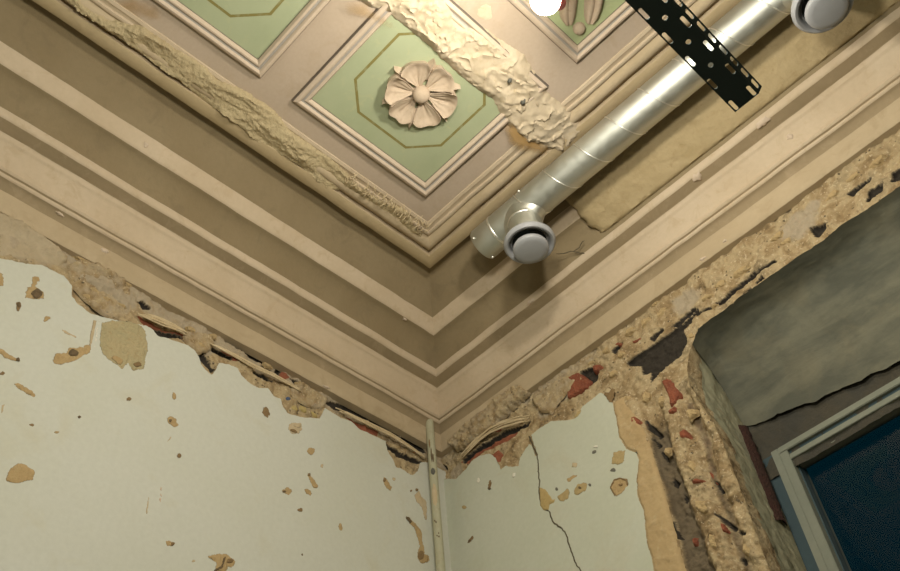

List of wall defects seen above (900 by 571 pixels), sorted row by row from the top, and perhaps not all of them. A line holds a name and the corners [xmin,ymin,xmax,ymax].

flaking render [0,129,900,571]
crack [529,436,581,571]